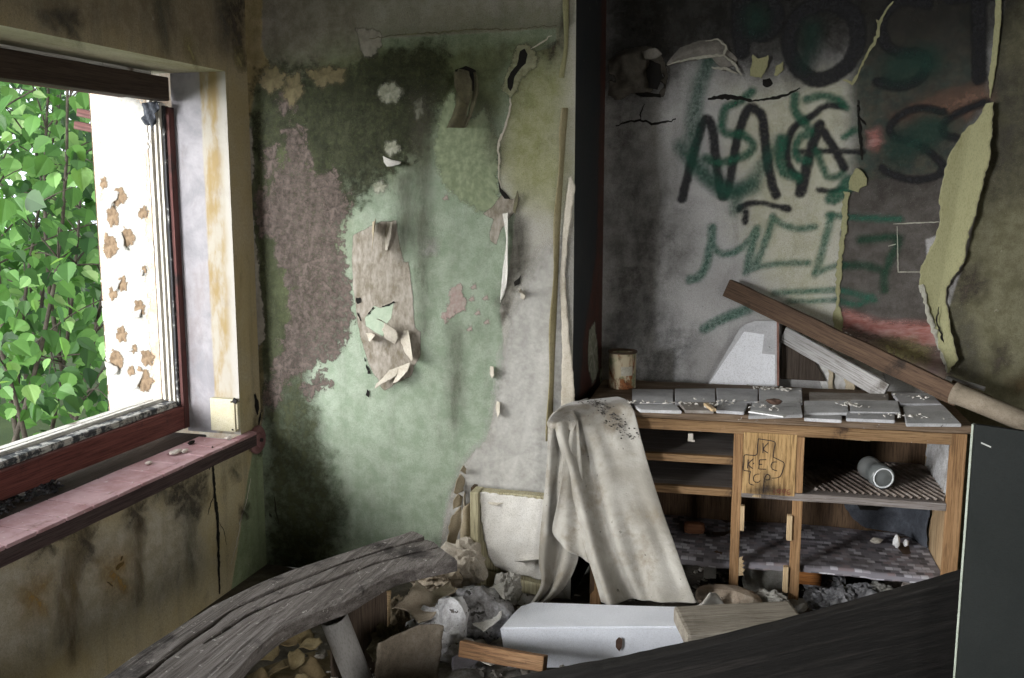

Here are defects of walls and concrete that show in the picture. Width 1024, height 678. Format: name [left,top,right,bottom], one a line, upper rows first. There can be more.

peeling [96,94,156,409]
spalling [249,64,421,425]
damp [250,42,453,568]
peeling [433,66,525,302]
crack [616,104,676,126]
crack [708,87,800,102]
peeling [918,0,1002,373]
damp [169,474,208,520]
crack [208,446,251,594]
peeling [447,465,466,544]